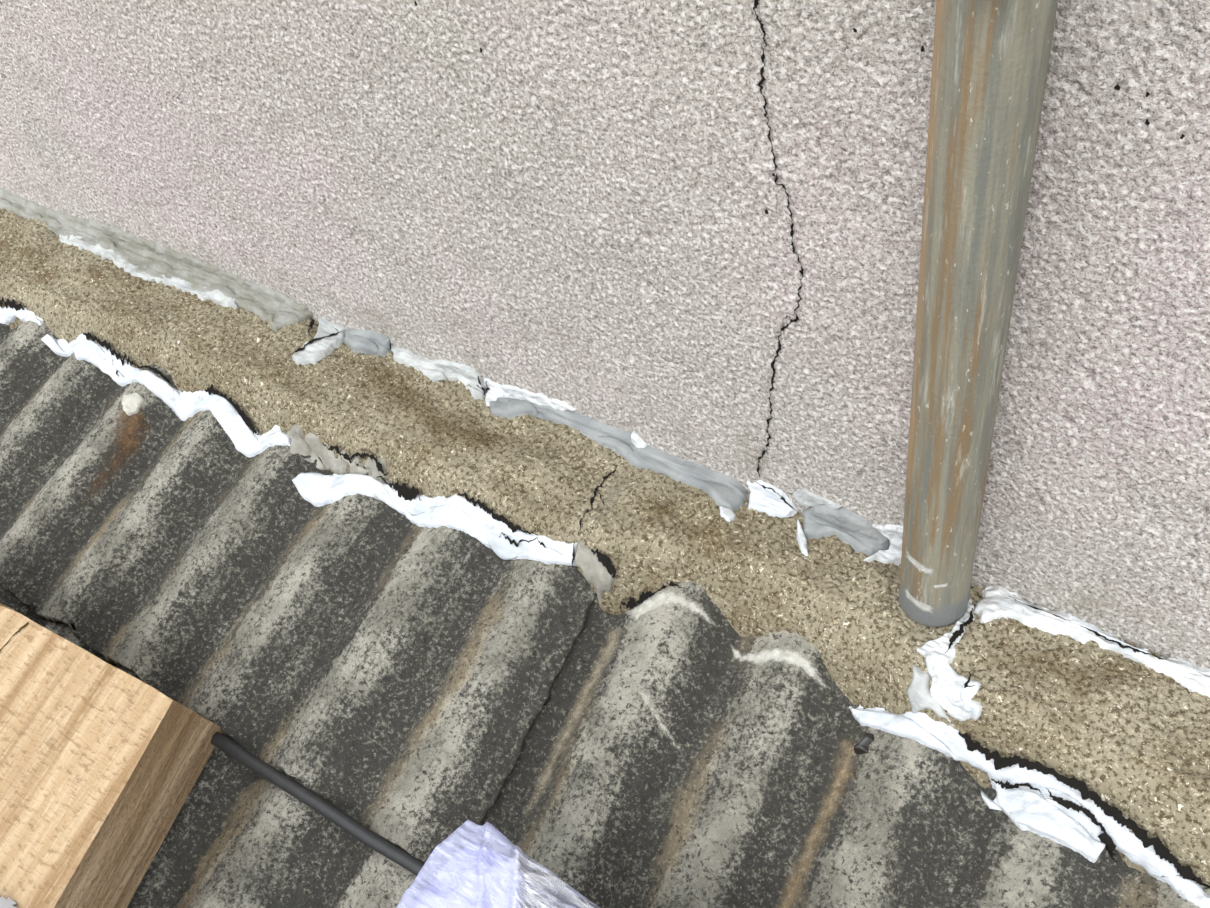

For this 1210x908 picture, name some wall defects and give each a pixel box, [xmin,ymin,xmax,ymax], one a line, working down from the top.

crack [753,0,804,477]
corrosion [117,412,141,459]
crack [577,465,617,536]